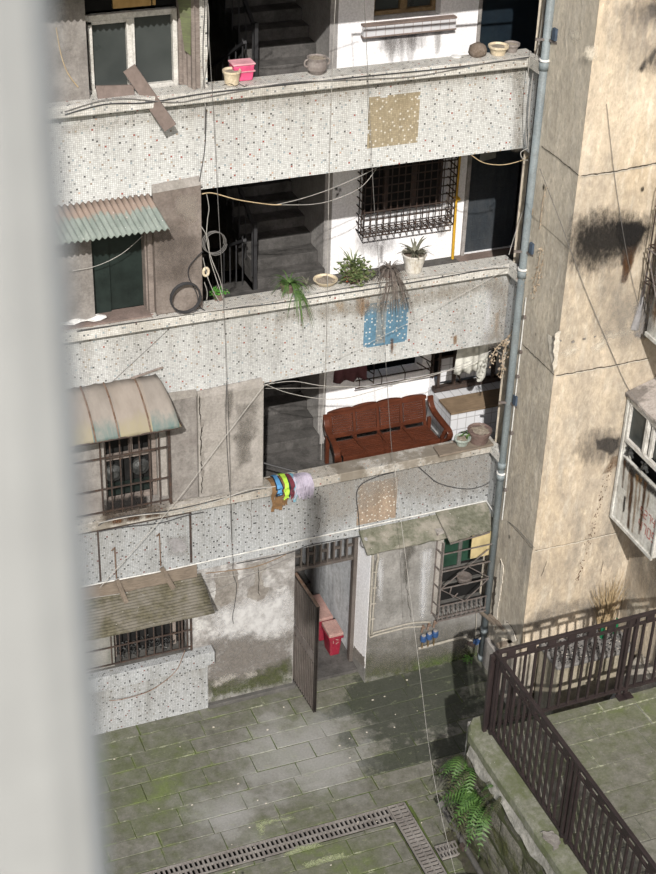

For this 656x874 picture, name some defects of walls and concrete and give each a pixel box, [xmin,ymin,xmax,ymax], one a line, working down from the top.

crack [198,396,206,493]
rust [622,458,656,534]
water stain [208,594,293,701]